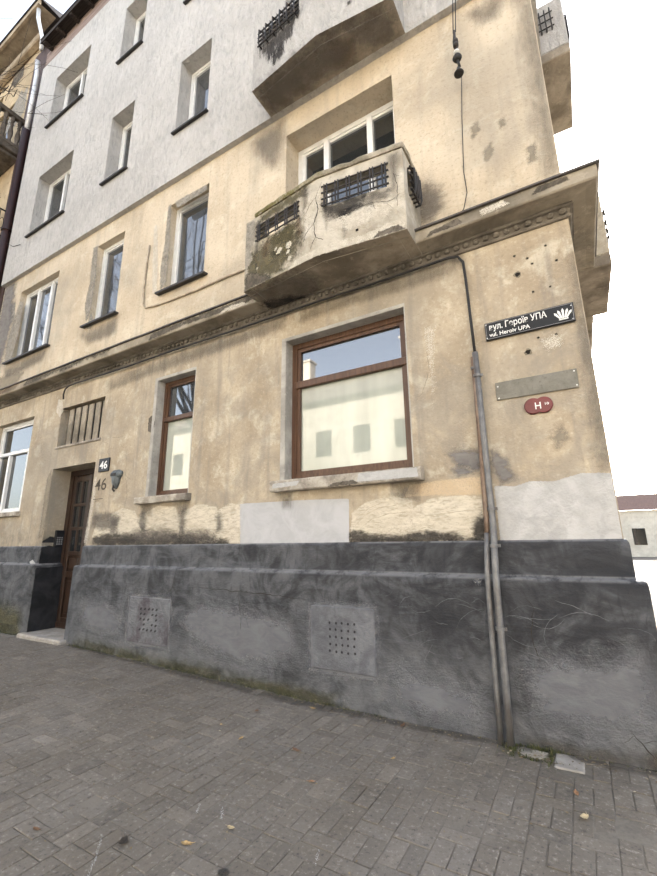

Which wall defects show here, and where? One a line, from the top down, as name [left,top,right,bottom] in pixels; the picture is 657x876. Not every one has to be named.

leakage [259,10,349,109]
crack [339,160,399,210]
flaking render [302,186,323,238]
crack [303,182,323,246]
spalling [274,201,406,271]
leakage [449,450,480,476]
leakage [492,452,513,482]